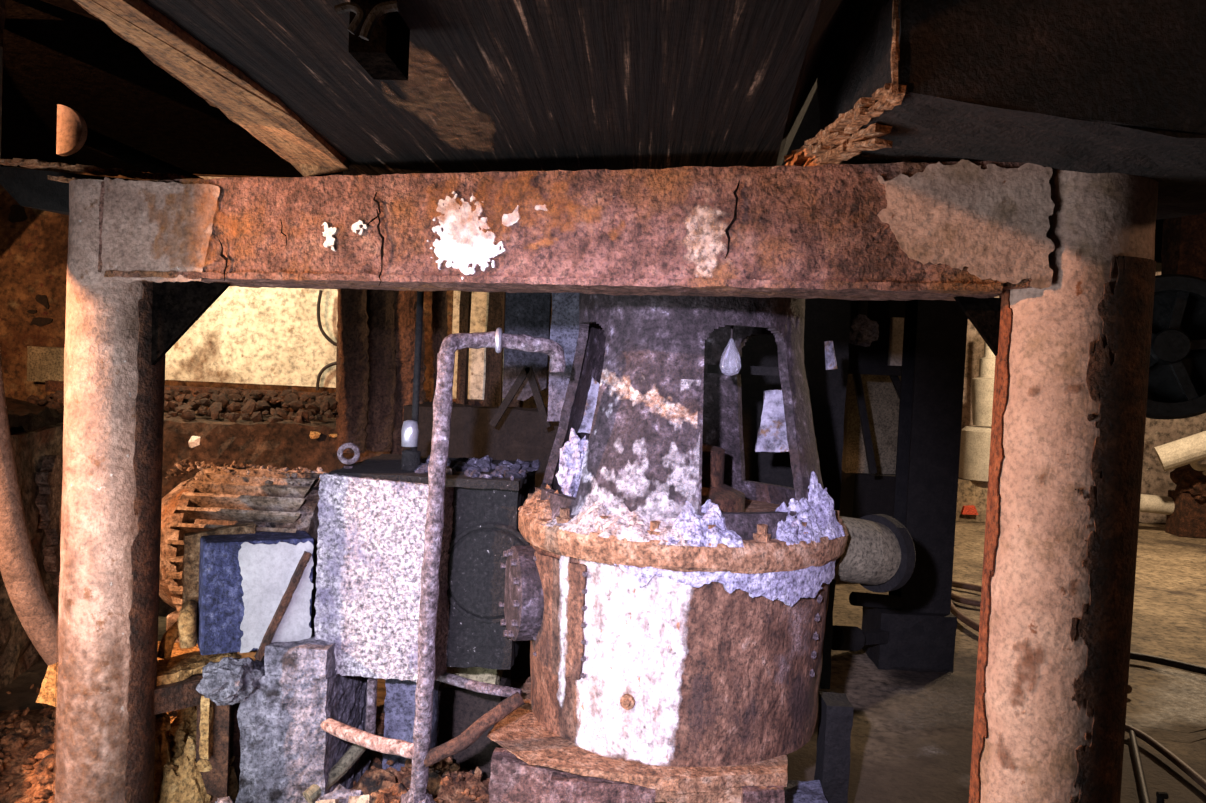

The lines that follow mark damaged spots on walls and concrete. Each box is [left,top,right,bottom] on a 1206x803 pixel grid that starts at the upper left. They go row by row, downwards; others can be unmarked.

crack [366,192,384,285]
corrosion [432,188,522,229]
crack [725,180,740,259]
peeling [877,159,1055,289]
corrosion [969,290,1013,803]
corrosion [1070,255,1156,803]